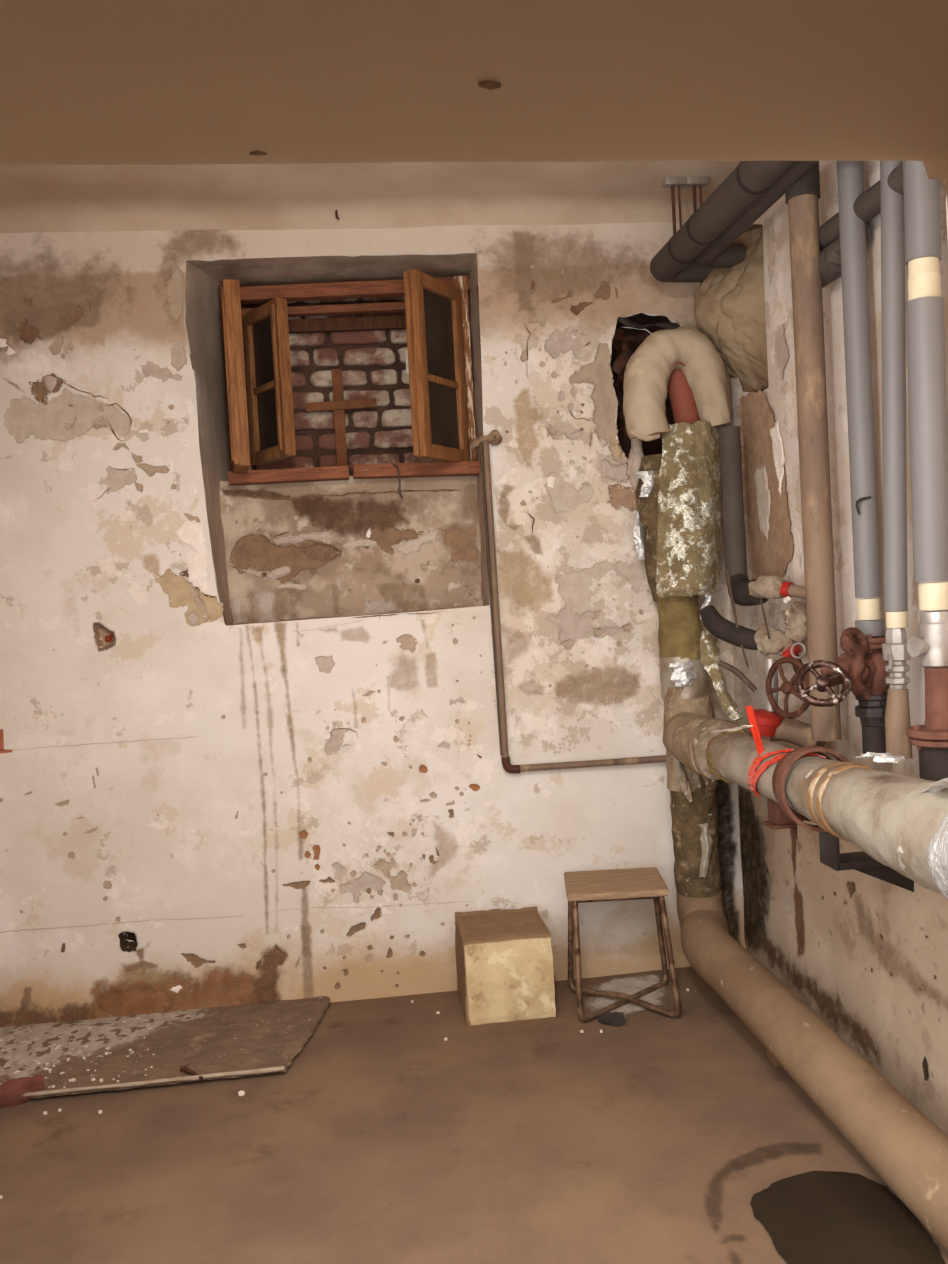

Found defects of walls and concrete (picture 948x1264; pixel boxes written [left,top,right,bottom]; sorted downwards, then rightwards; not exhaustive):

peeling [3,373,176,494]
crack [64,383,132,500]
spalling [529,281,680,513]
peeling [739,390,794,580]
flaking render [230,517,439,590]
water stain [237,588,295,675]
peeling [282,784,480,937]
rust [85,953,277,1019]
water stain [255,888,312,1002]
water stain [716,780,879,1063]
water stain [822,881,948,1006]
water stain [707,1143,819,1229]